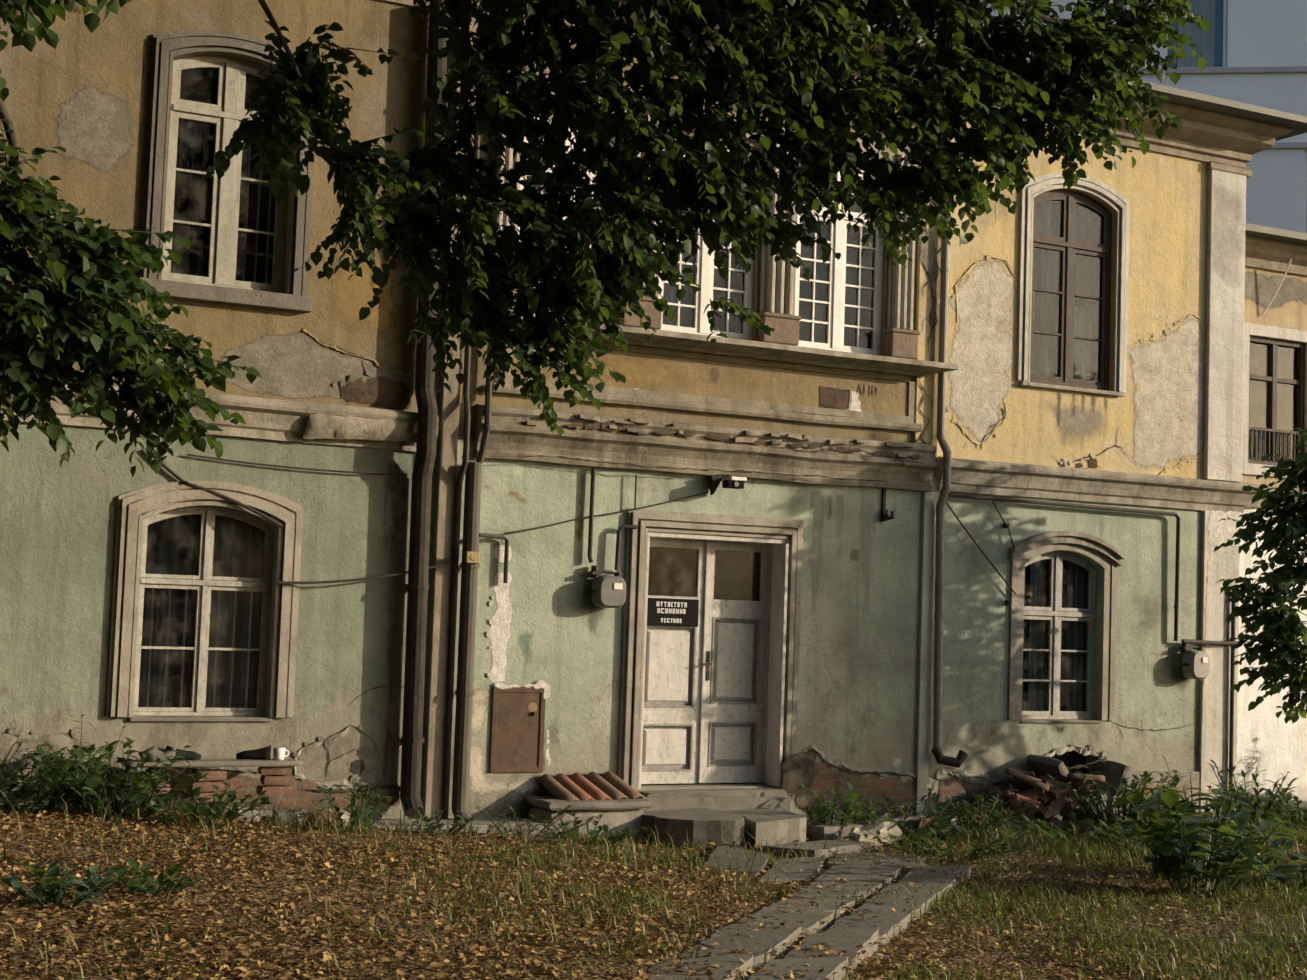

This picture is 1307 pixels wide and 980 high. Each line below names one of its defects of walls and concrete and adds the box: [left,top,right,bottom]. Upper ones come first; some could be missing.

peeling [1245,272,1307,308]
peeling [919,229,1019,449]
spalling [525,401,921,460]
leakage [1054,393,1108,440]
peeling [1125,312,1206,477]
crack [302,736,400,793]
peeling [469,688,540,795]
spalling [782,743,916,816]
spalling [936,767,1033,815]
spalling [1042,744,1109,800]